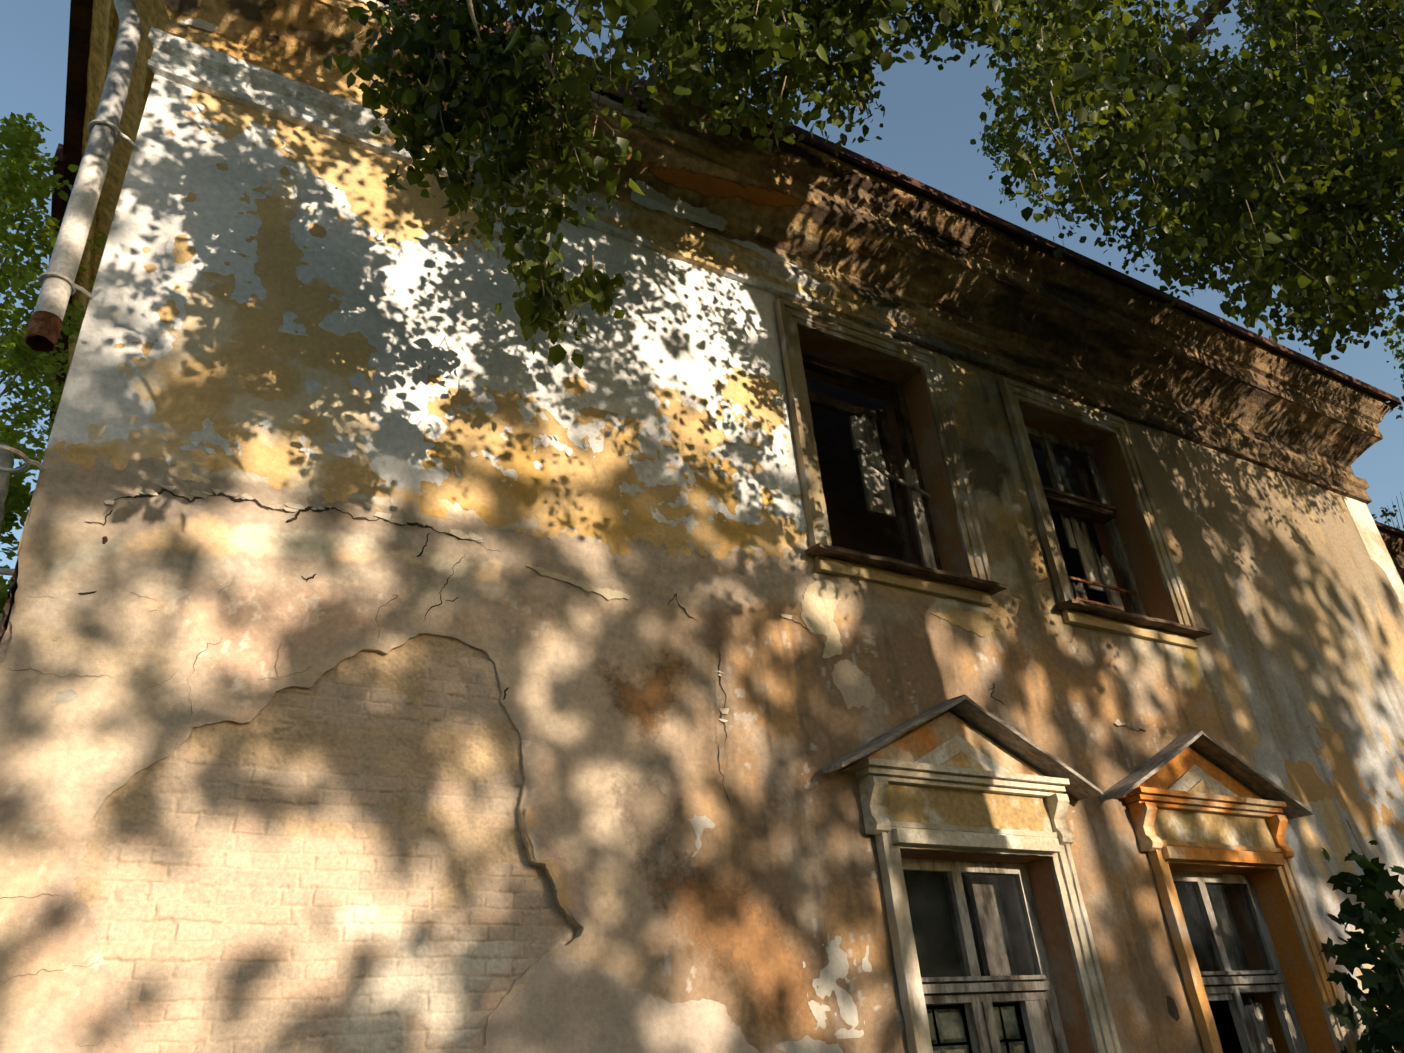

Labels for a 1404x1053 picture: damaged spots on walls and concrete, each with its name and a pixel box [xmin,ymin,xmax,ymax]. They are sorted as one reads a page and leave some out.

damp [164,0,200,14]
damp [229,0,276,22]
flaking render [358,0,440,32]
damp [801,200,969,257]
peeling [49,90,500,512]
damp [849,286,906,309]
peeling [419,363,810,574]
damp [962,449,1008,496]
crack [85,484,501,620]
peeling [800,579,875,709]
flaking render [72,635,603,1053]
peeling [775,935,872,1053]